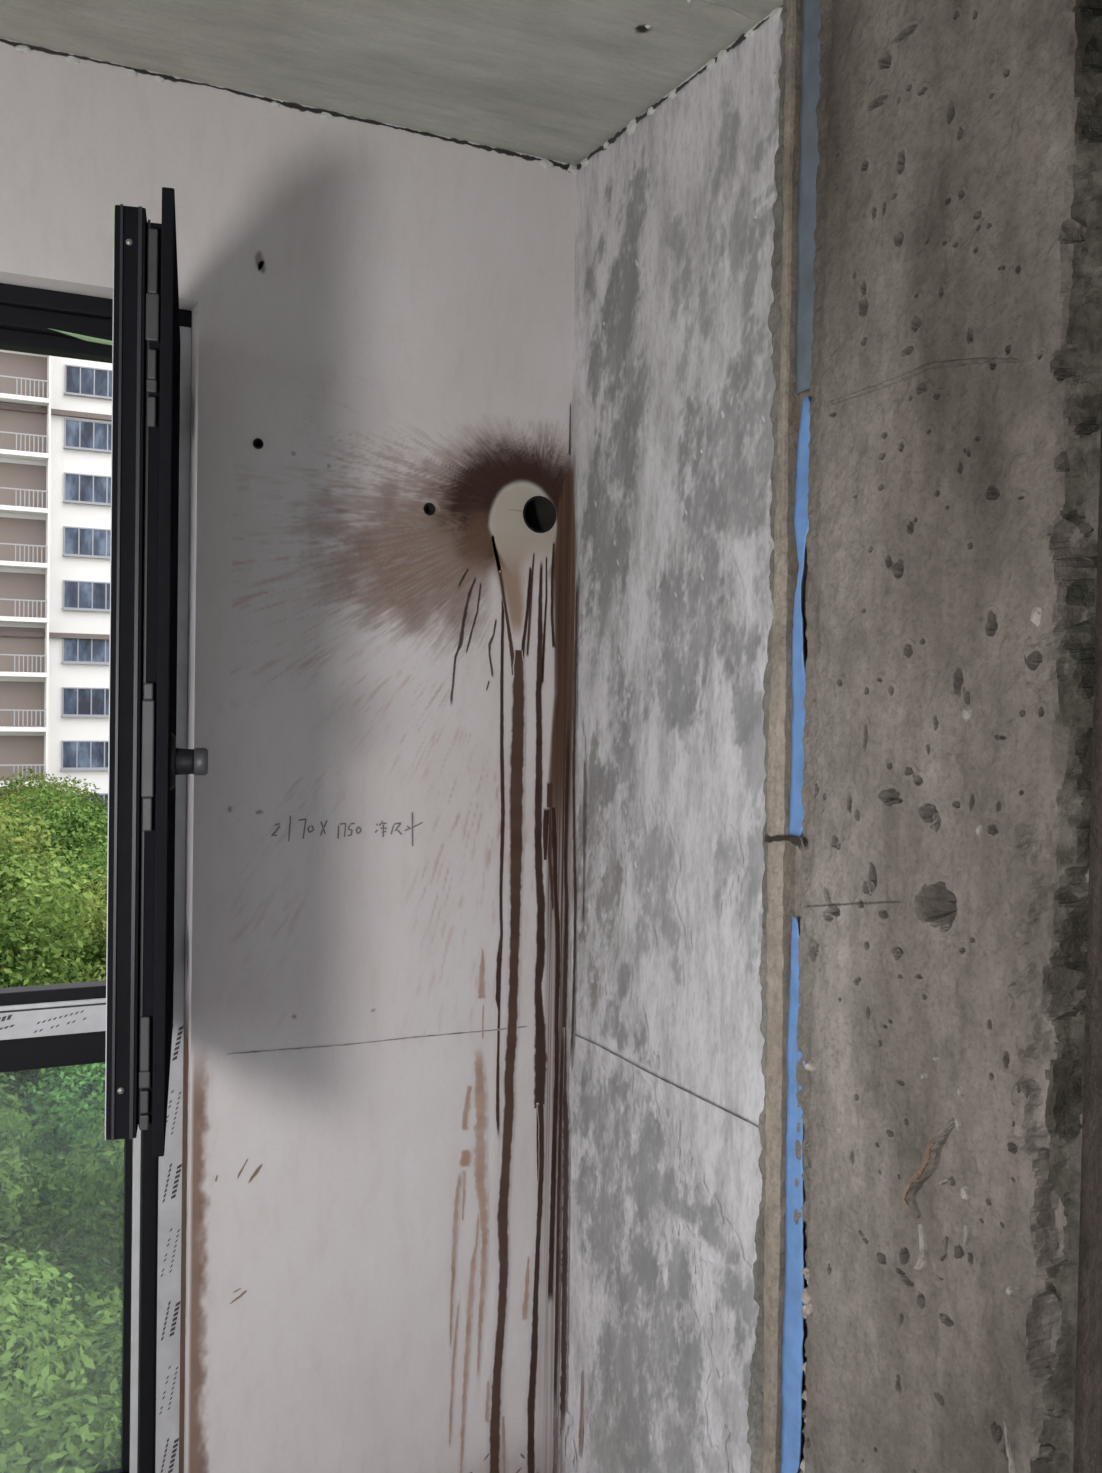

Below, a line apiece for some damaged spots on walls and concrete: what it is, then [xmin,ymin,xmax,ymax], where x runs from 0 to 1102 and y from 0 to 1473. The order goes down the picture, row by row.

water stain [253,248,268,276]
water stain [225,368,586,1473]